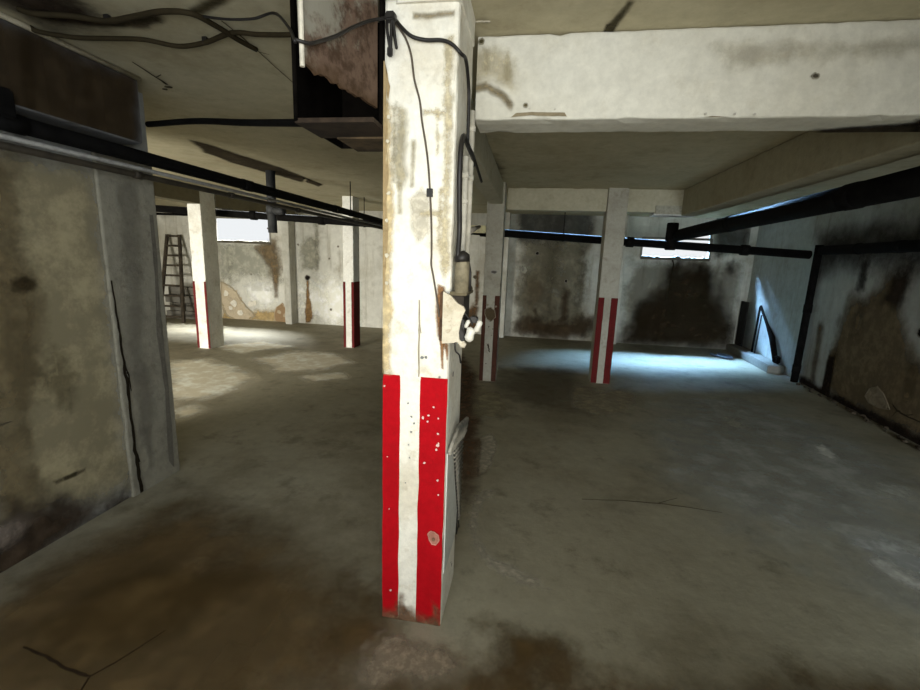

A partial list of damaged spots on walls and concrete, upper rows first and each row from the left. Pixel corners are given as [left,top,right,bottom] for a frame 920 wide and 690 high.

water stain [0,0,88,27]
water stain [0,155,131,573]
crack [111,280,144,493]
spalling [220,282,257,320]
spalling [274,303,286,322]
water stain [516,251,594,340]
water stain [623,263,735,348]
water stain [799,262,920,445]
crack [22,630,165,690]
water stain [336,598,570,690]